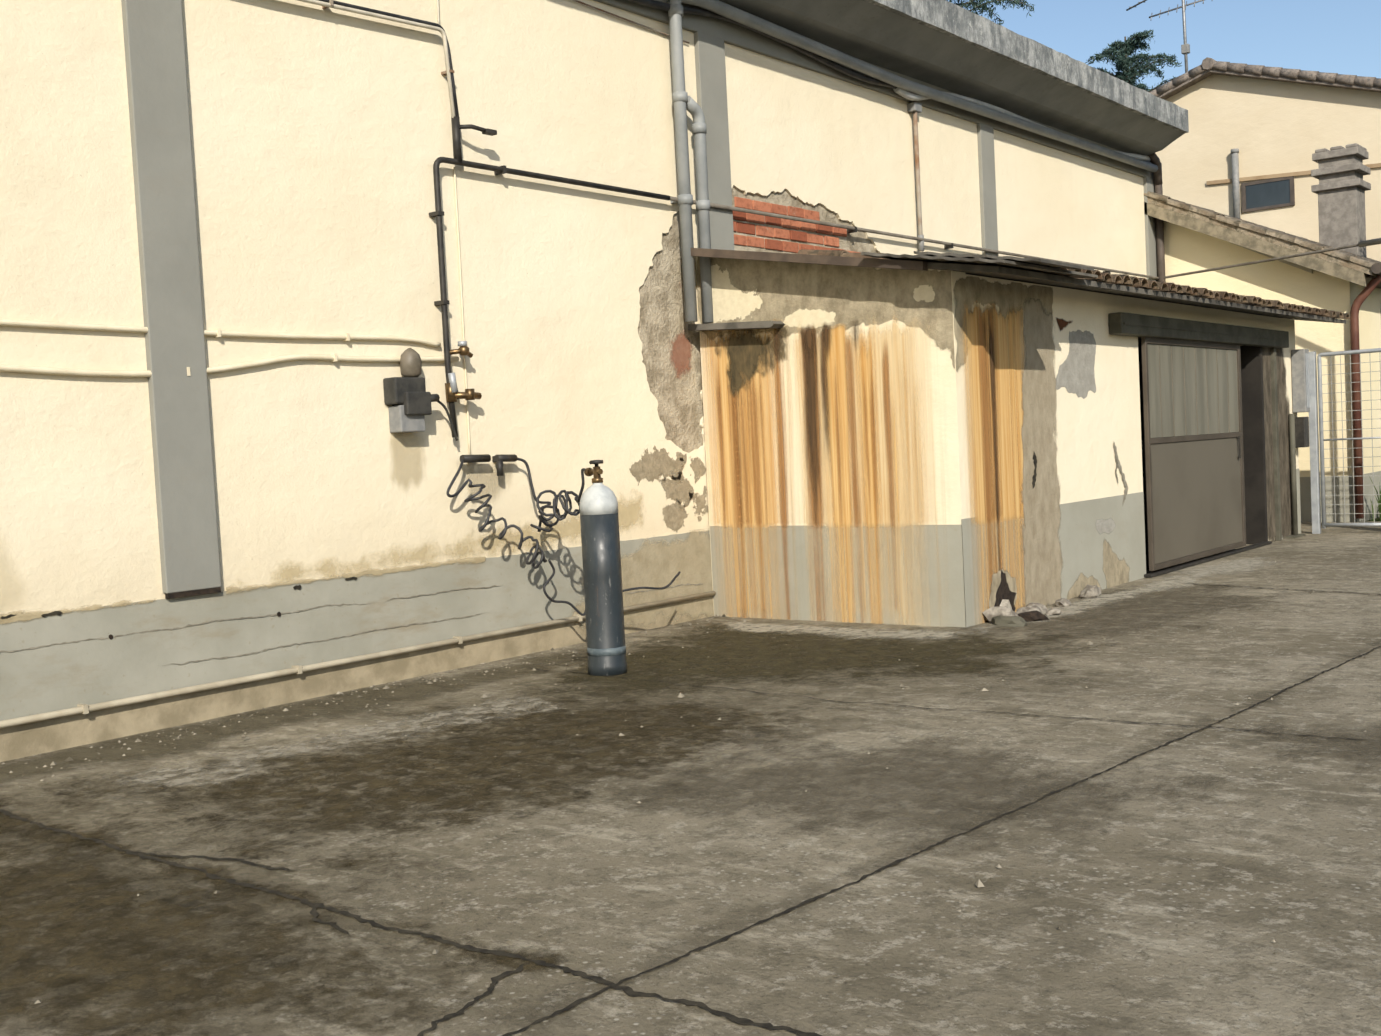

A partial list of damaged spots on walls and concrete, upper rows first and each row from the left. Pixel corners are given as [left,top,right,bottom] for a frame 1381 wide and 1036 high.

crack [0,585,500,666]
peeling [573,602,586,625]
corrosion [708,328,787,617]
corrosion [798,324,922,623]
flaking render [621,187,1130,627]
corrosion [965,306,1025,615]
crack [0,809,822,1036]